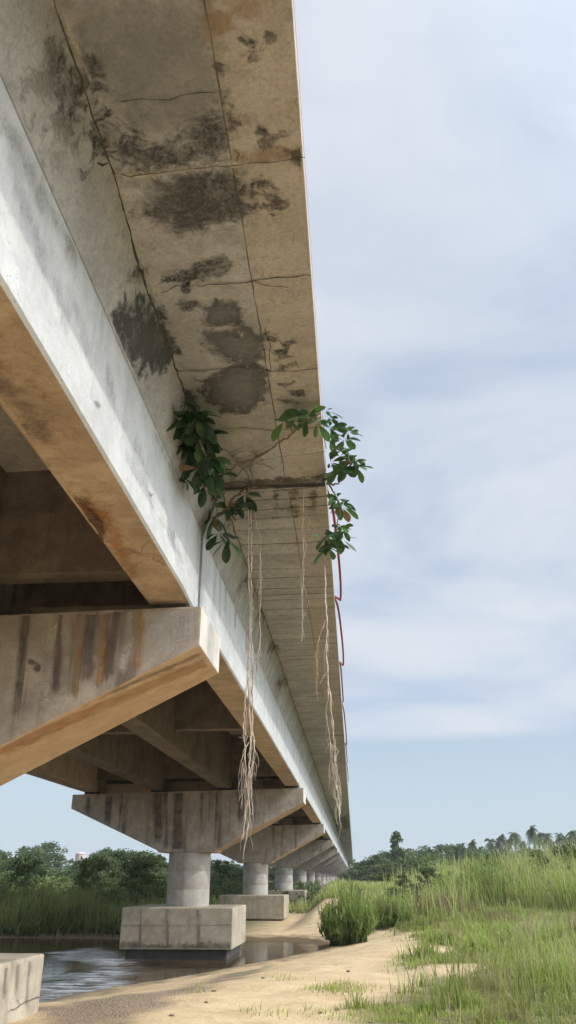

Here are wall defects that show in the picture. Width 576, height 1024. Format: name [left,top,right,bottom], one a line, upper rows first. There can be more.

damp [29,17,288,230]
crack [53,0,317,402]
damp [111,293,181,378]
damp [162,258,305,414]